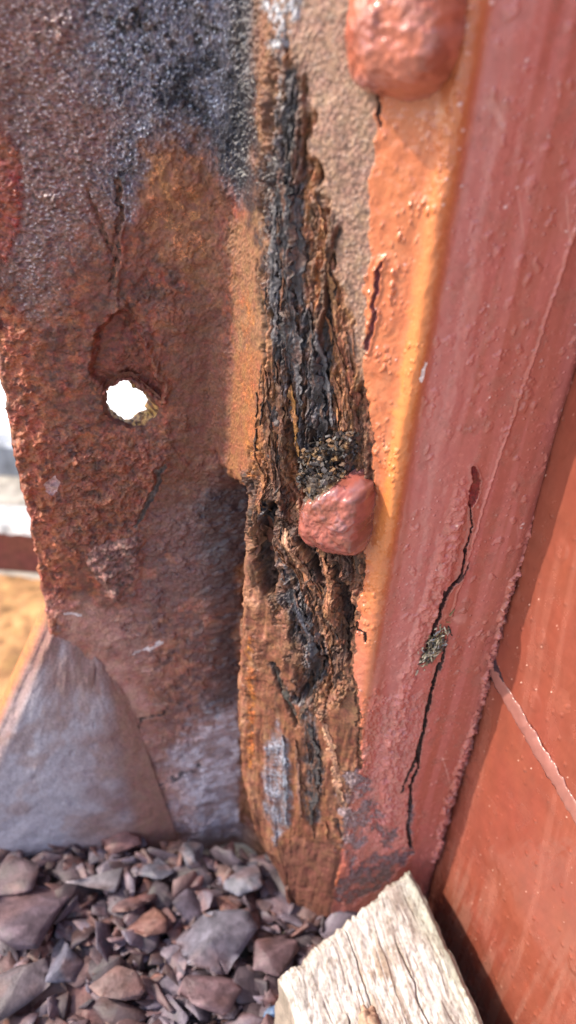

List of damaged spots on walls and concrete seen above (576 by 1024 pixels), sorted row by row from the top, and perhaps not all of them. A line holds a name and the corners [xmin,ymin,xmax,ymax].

rust [145,152,208,261]
crack [364,262,383,352]
rust [100,371,161,429]
peeling [361,391,377,493]
rust [87,535,143,604]
crack [400,466,481,849]
peeling [334,551,415,904]